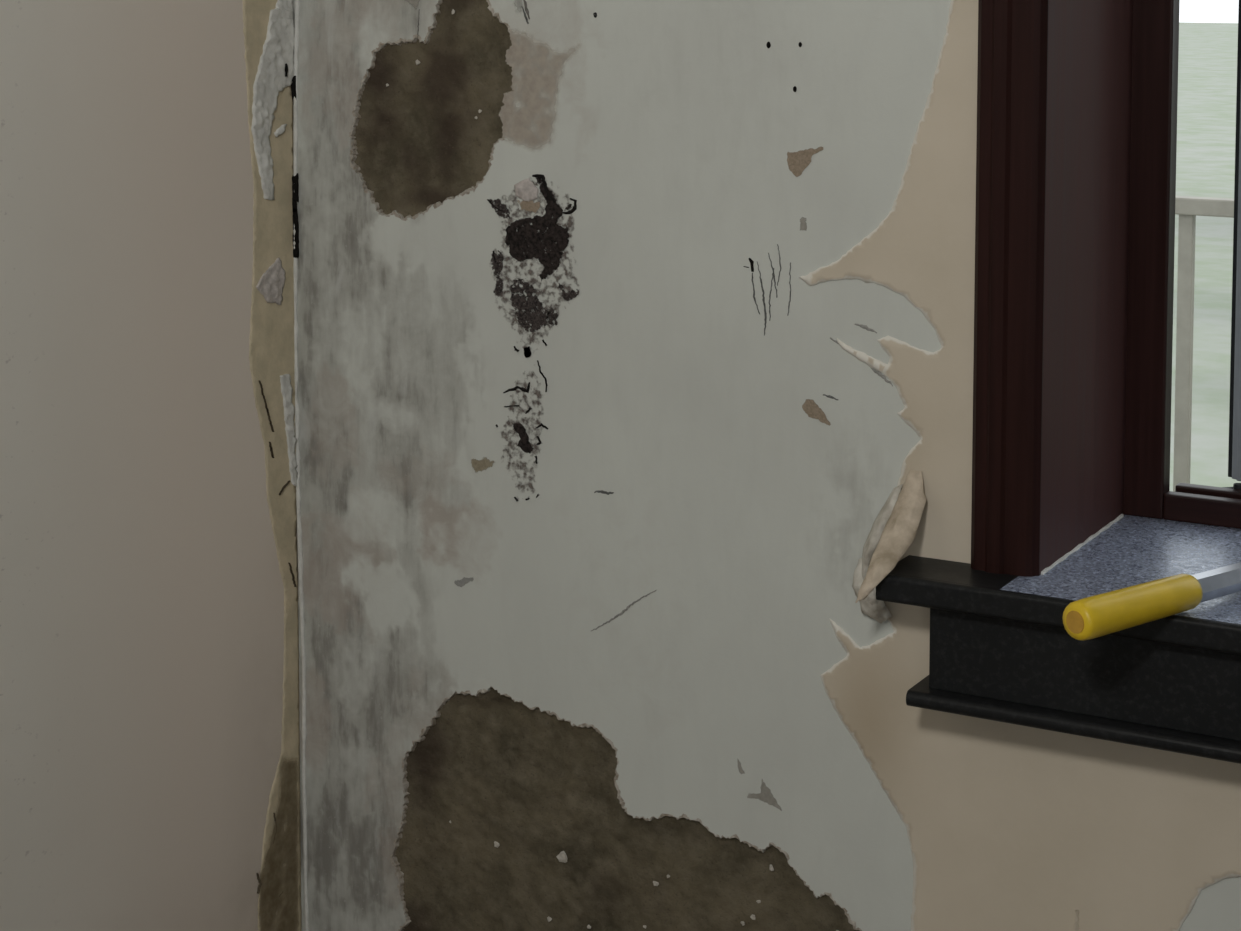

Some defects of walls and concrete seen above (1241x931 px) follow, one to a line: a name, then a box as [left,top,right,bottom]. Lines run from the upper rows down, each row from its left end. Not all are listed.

peeling [243,0,302,931]
mould [471,174,579,501]
flaking render [802,394,839,426]
flaking render [390,686,862,931]